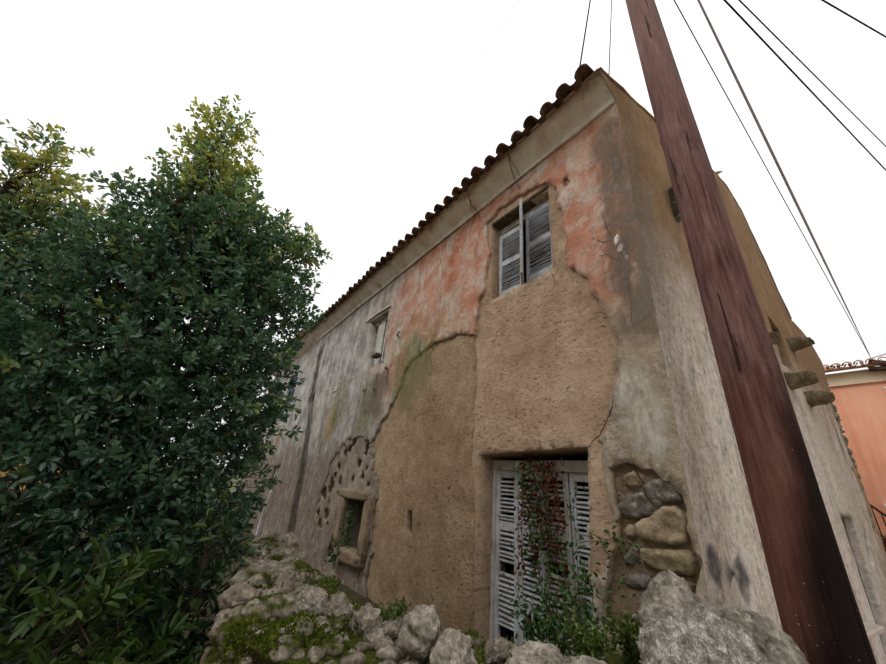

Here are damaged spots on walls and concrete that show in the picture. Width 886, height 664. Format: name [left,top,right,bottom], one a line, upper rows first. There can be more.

flaking render [312,179,619,645]
crack [588,398,614,447]
spalling [606,463,703,630]